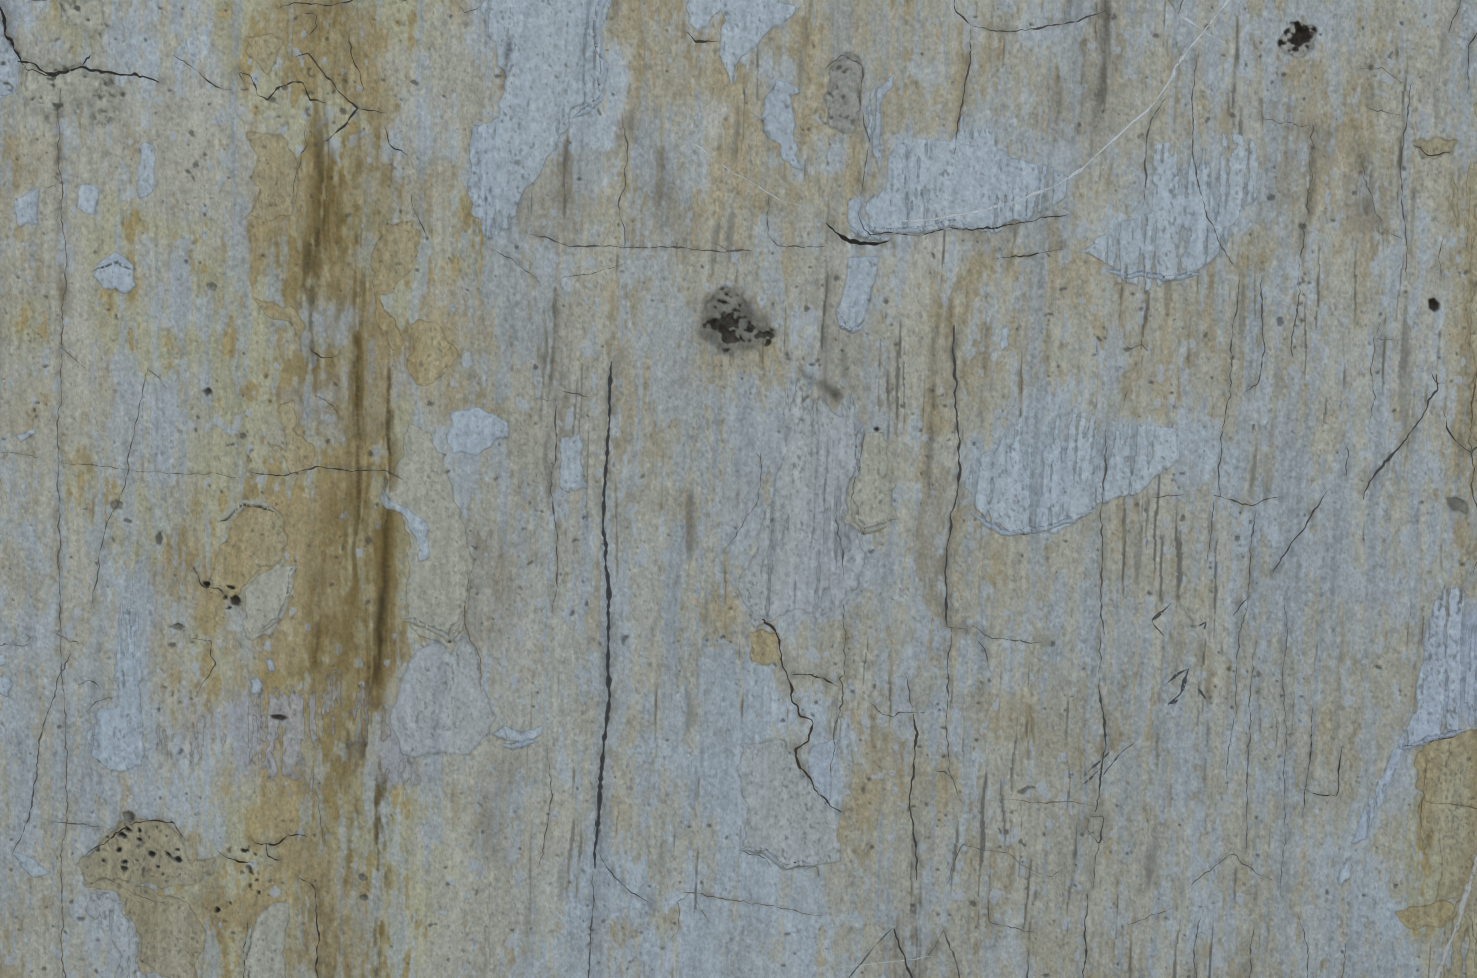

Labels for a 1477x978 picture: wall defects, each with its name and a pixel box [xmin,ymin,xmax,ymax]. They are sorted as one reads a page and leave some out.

spalling [0,21,125,127]
peeling [468,0,612,239]
peeling [847,75,1068,241]
crack [954,0,1110,153]
peeling [1080,132,1258,290]
crack [0,0,407,978]
crack [539,361,820,978]
crack [762,325,1059,884]
crack [1002,430,1107,978]
peeling [965,407,1178,537]
crack [1127,56,1477,978]
peeling [1396,588,1477,978]